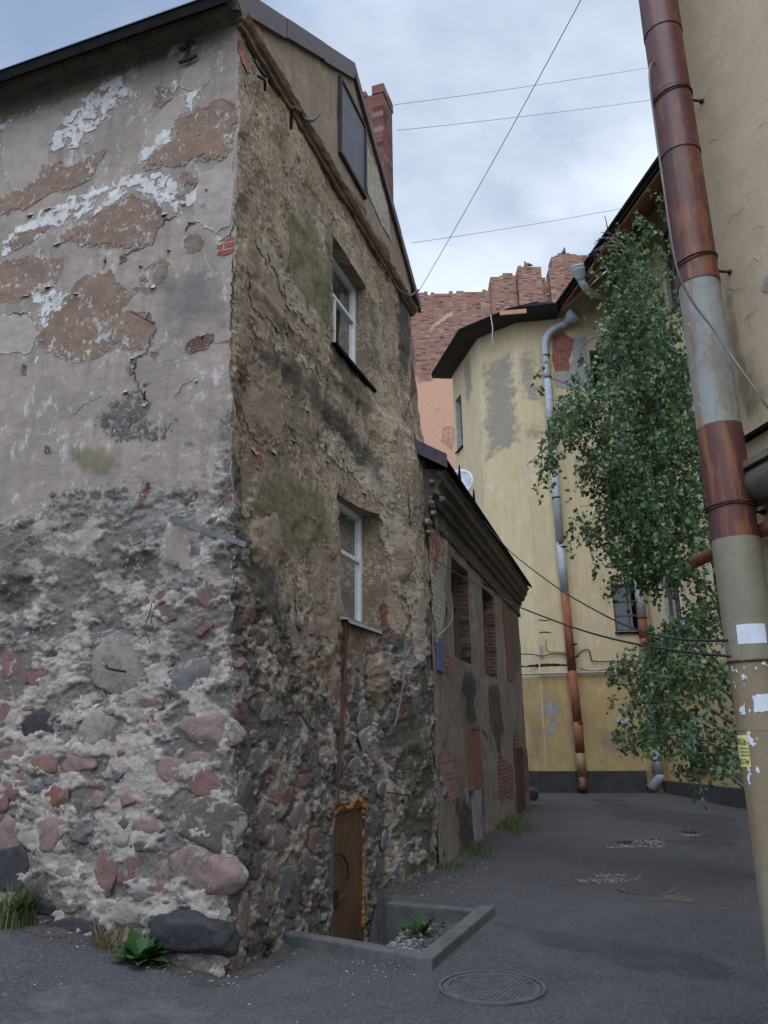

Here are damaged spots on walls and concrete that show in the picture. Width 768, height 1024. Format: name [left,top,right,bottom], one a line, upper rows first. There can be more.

peeling [0,38,238,375]
crack [70,331,168,416]
peeling [464,353,538,458]
peeling [551,332,590,390]
flaking render [0,358,460,977]